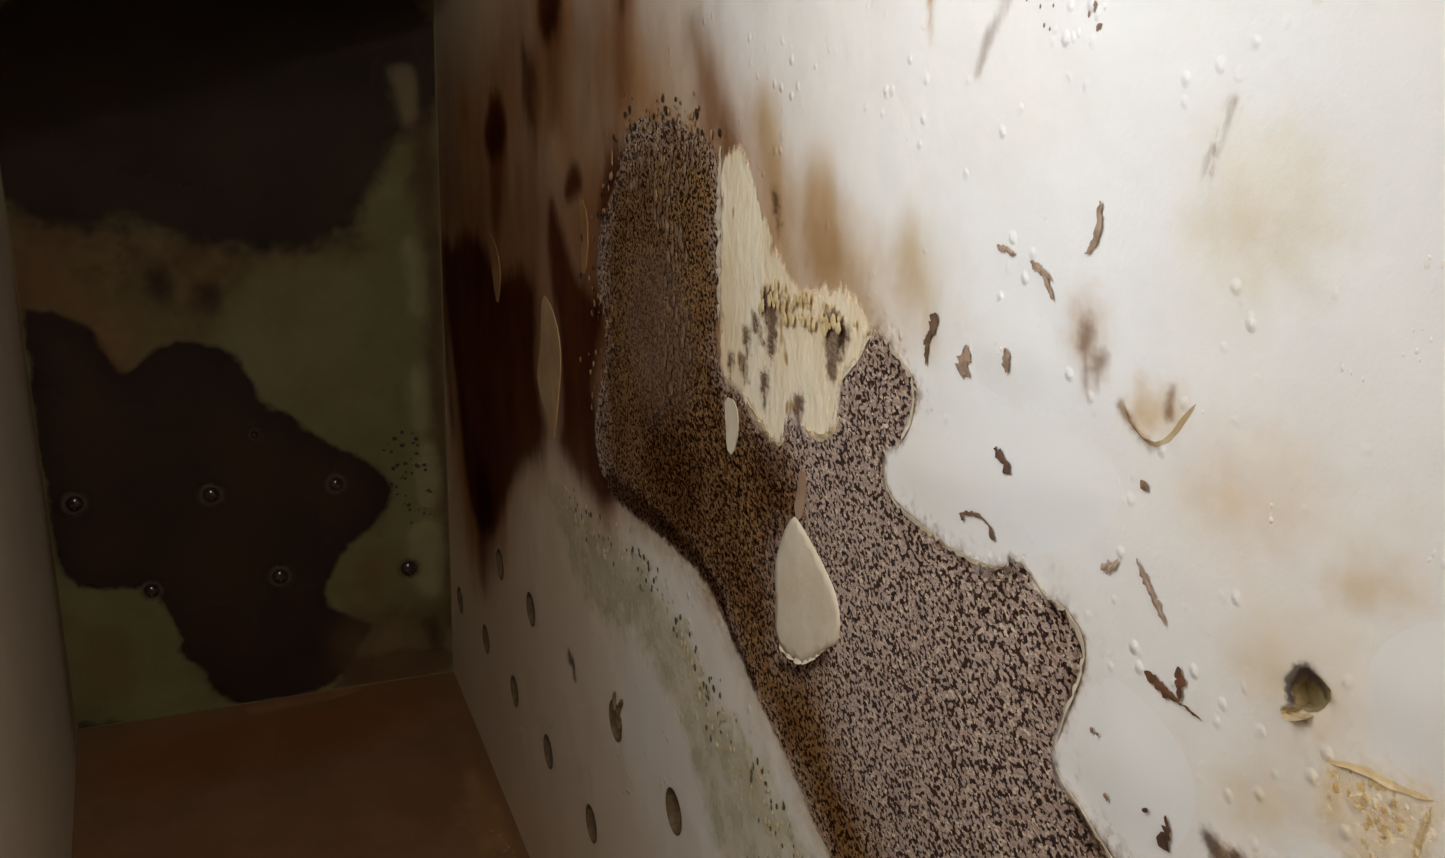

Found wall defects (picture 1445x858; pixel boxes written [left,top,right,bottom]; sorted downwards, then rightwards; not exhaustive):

leakage [540,0,559,36]
leakage [0,0,542,703]
peeling [537,296,562,438]
leakage [550,208,611,499]
peeling [569,90,1113,858]
peeling [1124,404,1196,447]
spalling [1280,662,1331,722]
spalling [1156,815,1170,852]